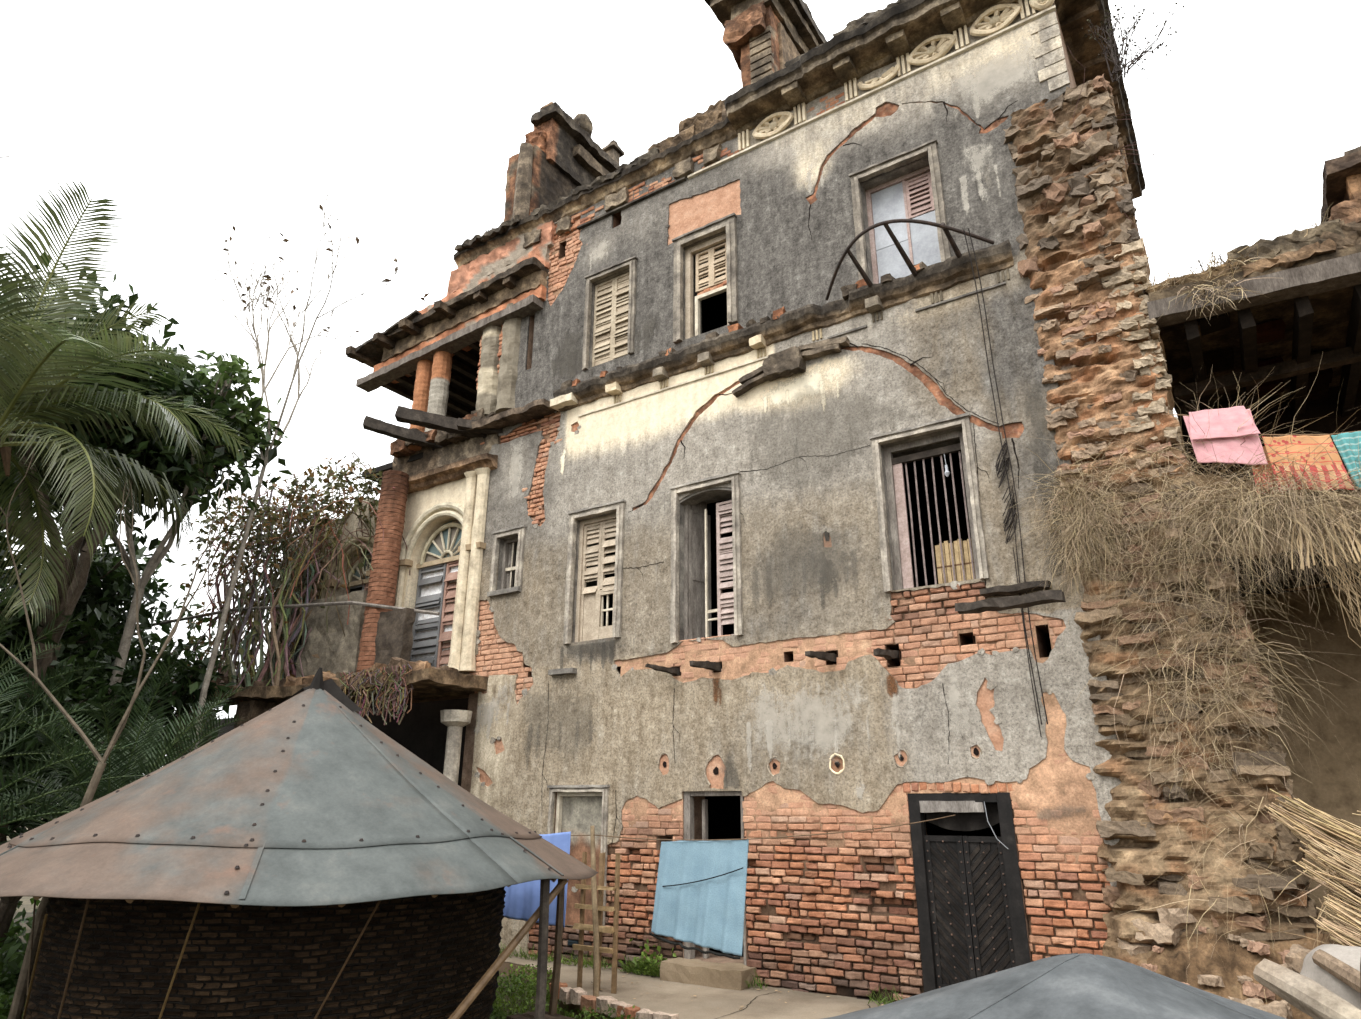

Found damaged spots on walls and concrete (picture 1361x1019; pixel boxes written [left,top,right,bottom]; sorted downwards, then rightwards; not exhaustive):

flaking render [546,205,604,306]
flaking render [628,177,675,202]
flaking render [665,180,741,245]
crack [806,101,1016,239]
flaking render [499,411,581,528]
crack [630,381,740,512]
crack [842,343,1024,500]
flaking render [469,600,533,704]
flaking render [612,581,1066,689]
flaking render [527,796,684,969]
flaking render [742,678,1112,1002]